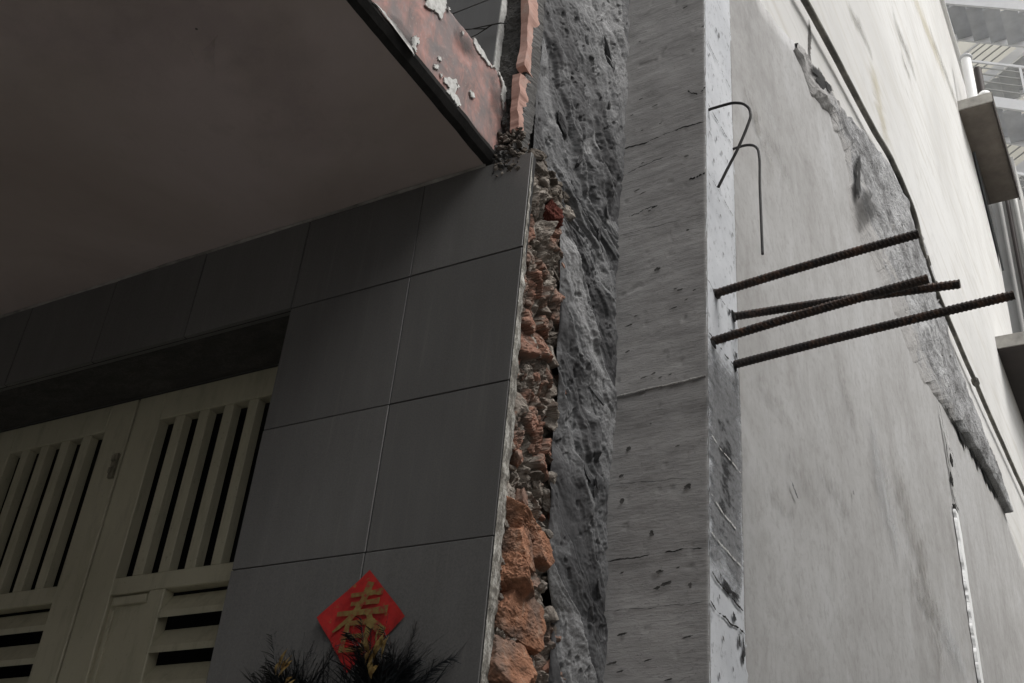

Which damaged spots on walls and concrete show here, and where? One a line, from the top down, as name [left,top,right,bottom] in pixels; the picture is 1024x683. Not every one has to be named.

spalling [372,2,420,56]
peeling [424,0,451,19]
peeling [433,56,475,107]
peeling [604,36,615,110]
spalling [710,43,1016,513]
spalling [461,0,575,683]